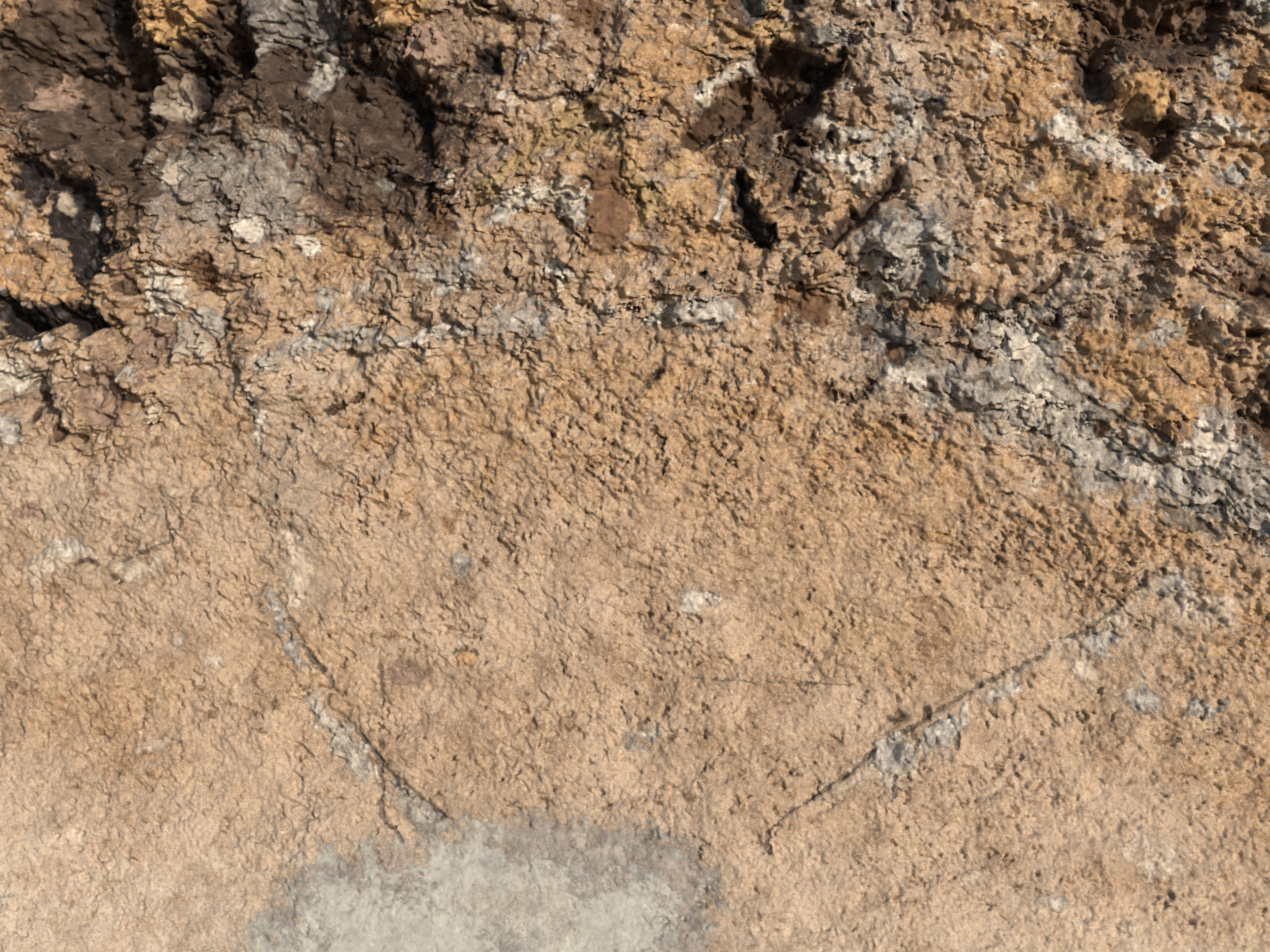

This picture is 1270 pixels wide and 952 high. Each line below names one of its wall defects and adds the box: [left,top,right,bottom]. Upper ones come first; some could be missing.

water stain [771,201,1270,562]
water stain [303,691,378,783]
crack [276,594,453,842]
crack [691,676,855,686]
crack [765,556,1172,855]
water stain [184,787,749,952]